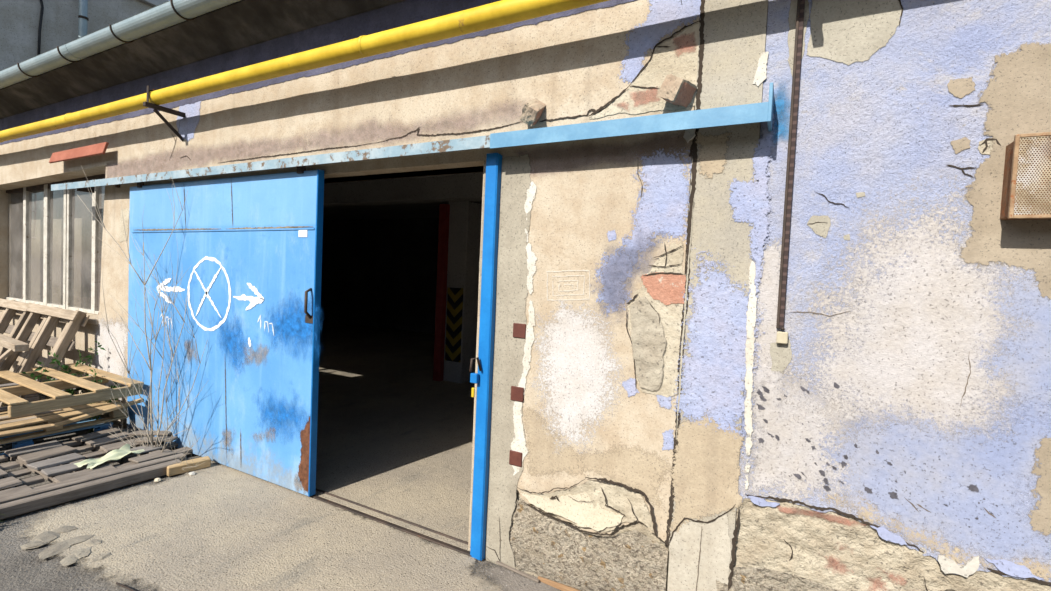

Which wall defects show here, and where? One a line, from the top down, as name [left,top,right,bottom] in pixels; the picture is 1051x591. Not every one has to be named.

spalling [588,0,701,119]
peeling [788,0,902,76]
crack [220,109,604,163]
peeling [510,42,1051,591]
crack [515,0,1051,591]